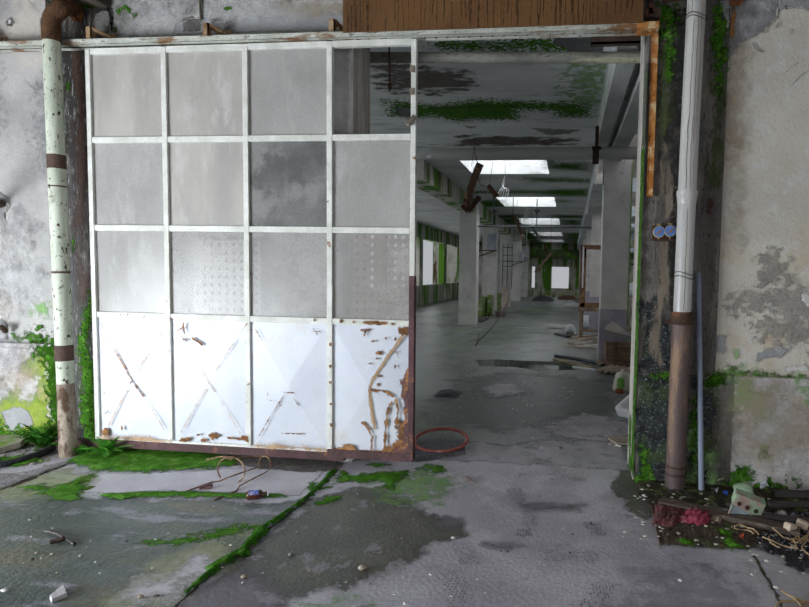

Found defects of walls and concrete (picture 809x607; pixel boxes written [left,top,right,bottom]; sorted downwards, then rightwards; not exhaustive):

flaking render [720,0,809,59]
water stain [415,0,703,520]
flaking render [722,247,809,362]
corrosion [101,325,144,439]
corrosion [179,392,298,449]
corrosion [305,276,416,455]
water stain [686,375,809,485]